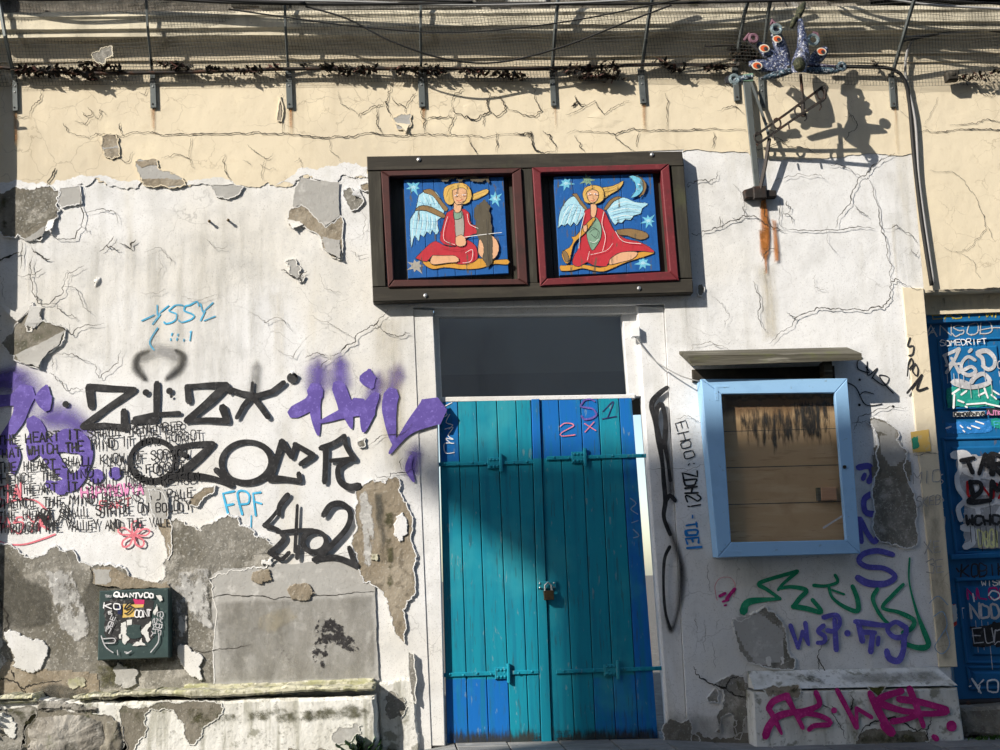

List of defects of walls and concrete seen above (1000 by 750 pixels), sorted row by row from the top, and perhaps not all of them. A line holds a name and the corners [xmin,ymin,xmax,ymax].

water stain [2,0,229,13]
peeling [135,158,186,189]
peeling [0,185,83,242]
peeling [287,177,368,261]
crack [63,85,1000,341]
corrosion [759,200,778,272]
peeling [0,300,67,370]
crack [256,310,406,368]
peeling [866,417,919,549]
peeling [0,485,274,750]
peeling [350,476,418,721]
peeling [661,674,749,743]